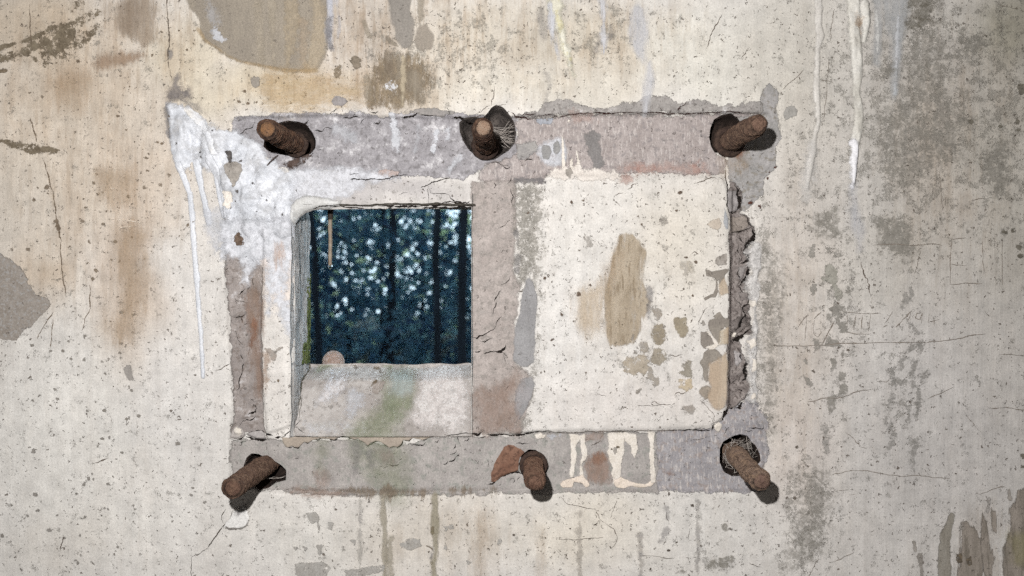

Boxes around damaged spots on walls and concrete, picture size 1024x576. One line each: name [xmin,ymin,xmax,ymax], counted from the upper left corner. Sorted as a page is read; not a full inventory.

crack [304,88,741,156]
water stain [805,0,824,189]
peeling [0,248,51,341]
water stain [165,76,396,379]
spalling [222,76,797,510]
rust [491,445,524,482]